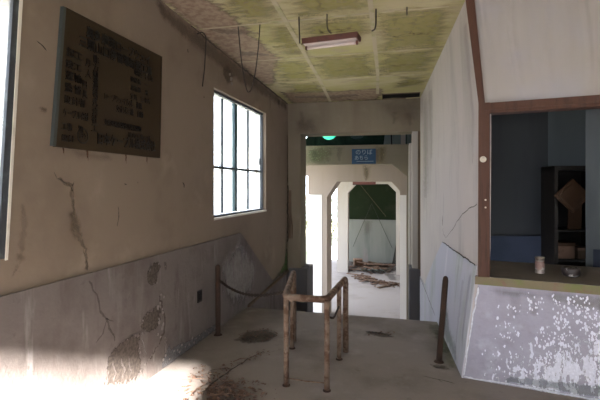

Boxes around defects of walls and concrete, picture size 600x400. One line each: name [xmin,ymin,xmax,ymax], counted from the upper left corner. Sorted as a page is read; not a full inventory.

leakage [159,0,383,109]
crack [71,216,79,237]
crack [443,204,477,265]
spalling [103,294,215,385]
leakage [463,287,600,400]